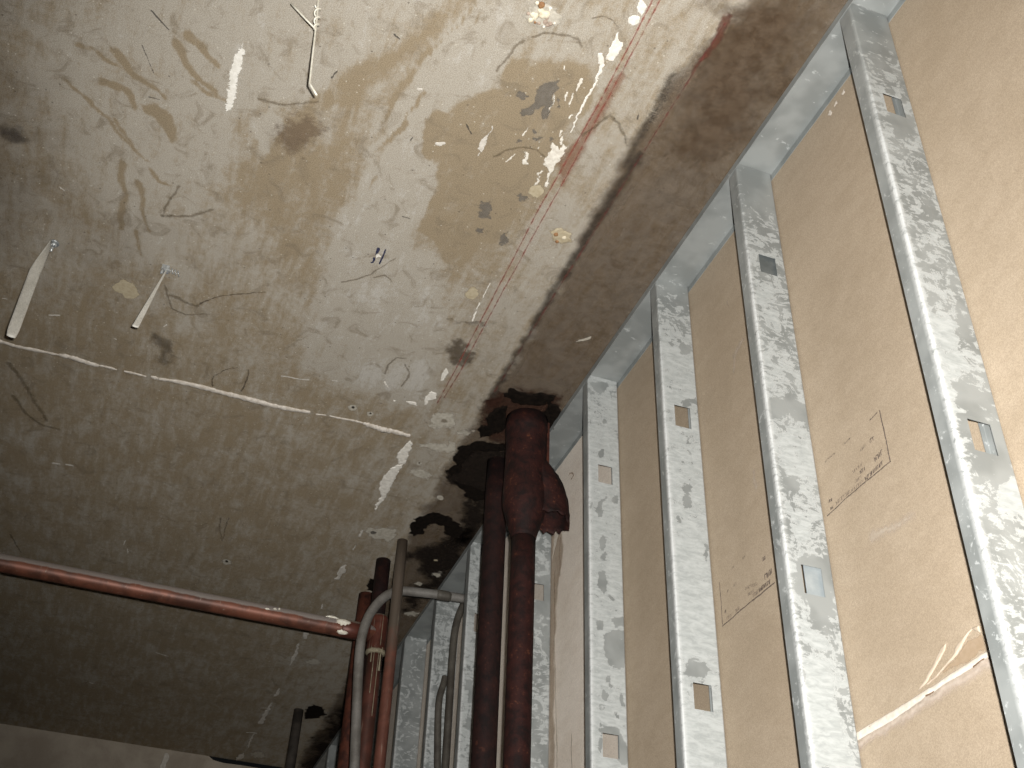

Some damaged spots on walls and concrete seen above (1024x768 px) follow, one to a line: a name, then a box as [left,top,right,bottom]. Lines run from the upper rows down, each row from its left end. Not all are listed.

leakage [517,66,583,119]
peeling [570,33,623,133]
leakage [476,201,492,233]
peeling [375,441,413,510]
leakage [446,388,561,502]